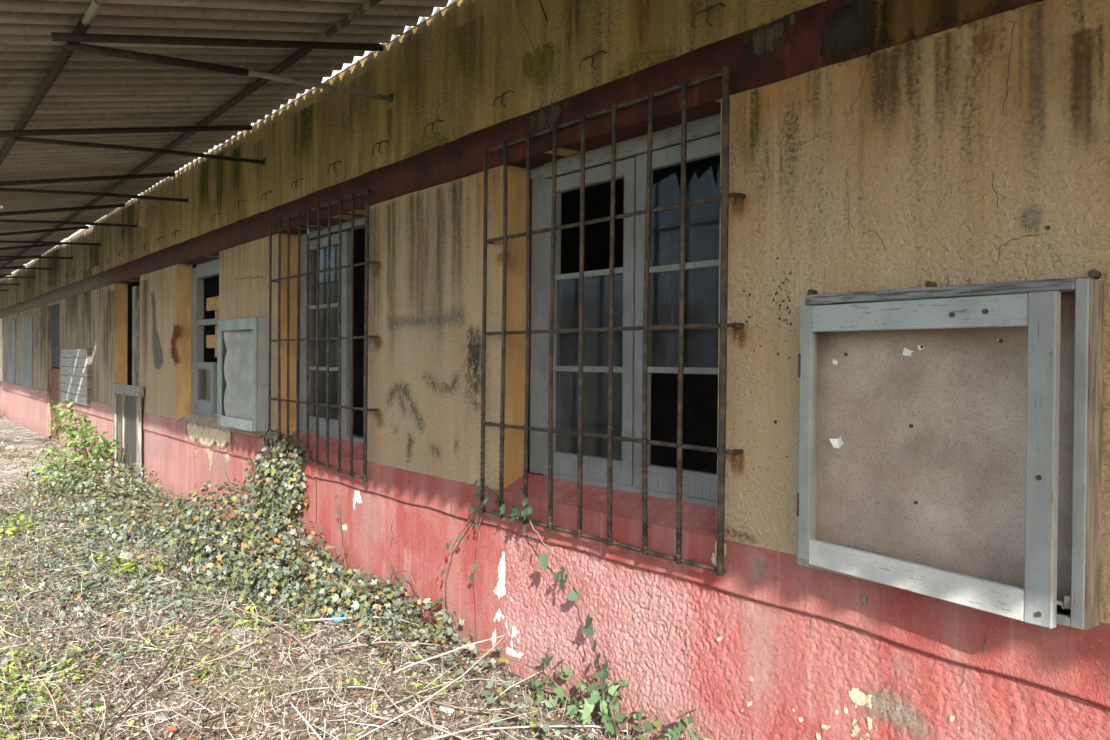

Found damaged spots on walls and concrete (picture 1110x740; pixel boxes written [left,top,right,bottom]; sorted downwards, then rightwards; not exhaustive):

peeling [820,0,1019,64]
crack [991,168,1064,267]
damp [389,312,482,387]
spalling [186,421,231,471]
peeling [353,489,362,510]
peeling [491,551,526,658]
spalling [816,688,877,740]